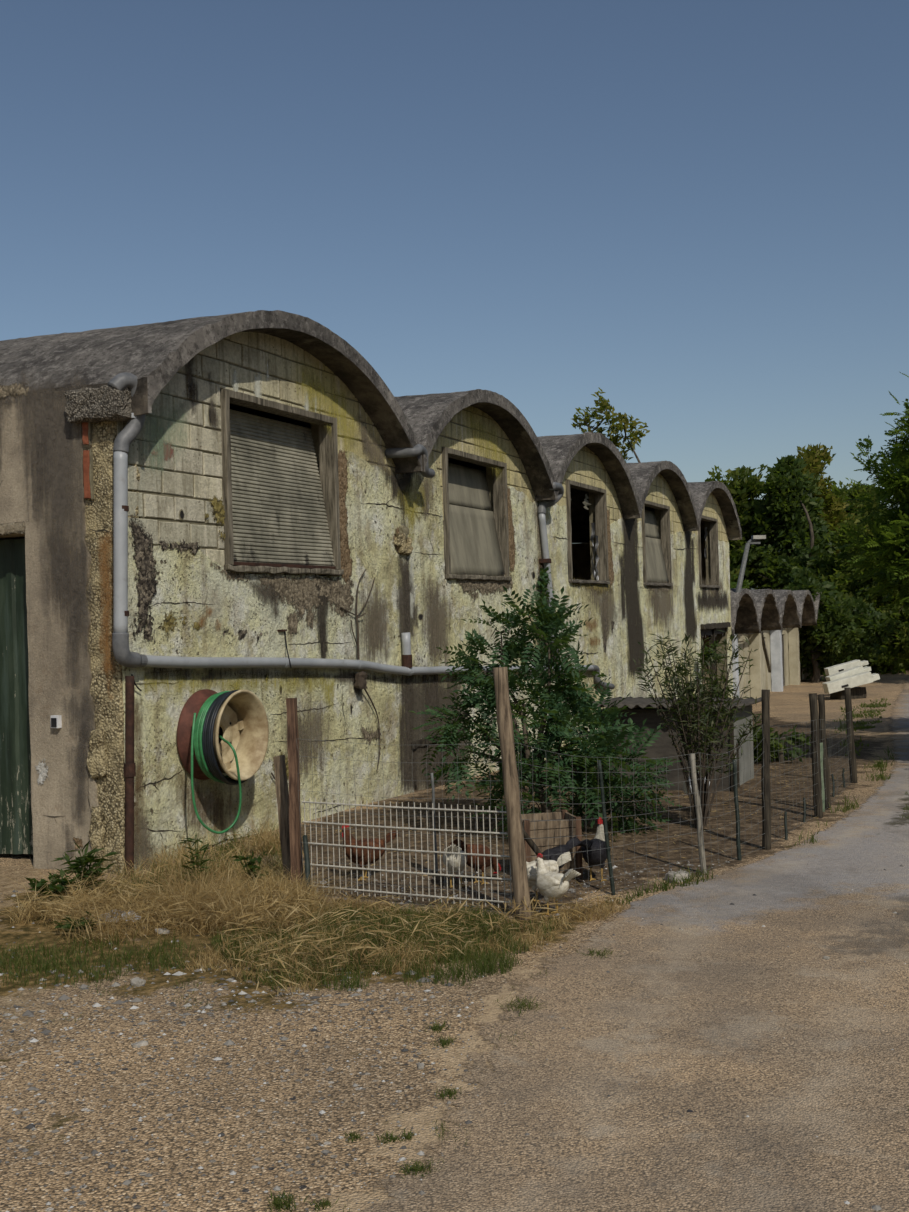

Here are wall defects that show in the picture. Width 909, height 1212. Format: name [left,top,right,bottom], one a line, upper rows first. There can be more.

damp [0,373,94,856]
spalling [128,513,202,642]
peeling [205,495,226,541]
spalling [210,448,354,639]
damp [145,558,469,792]
damp [361,423,431,535]
damp [590,515,728,676]